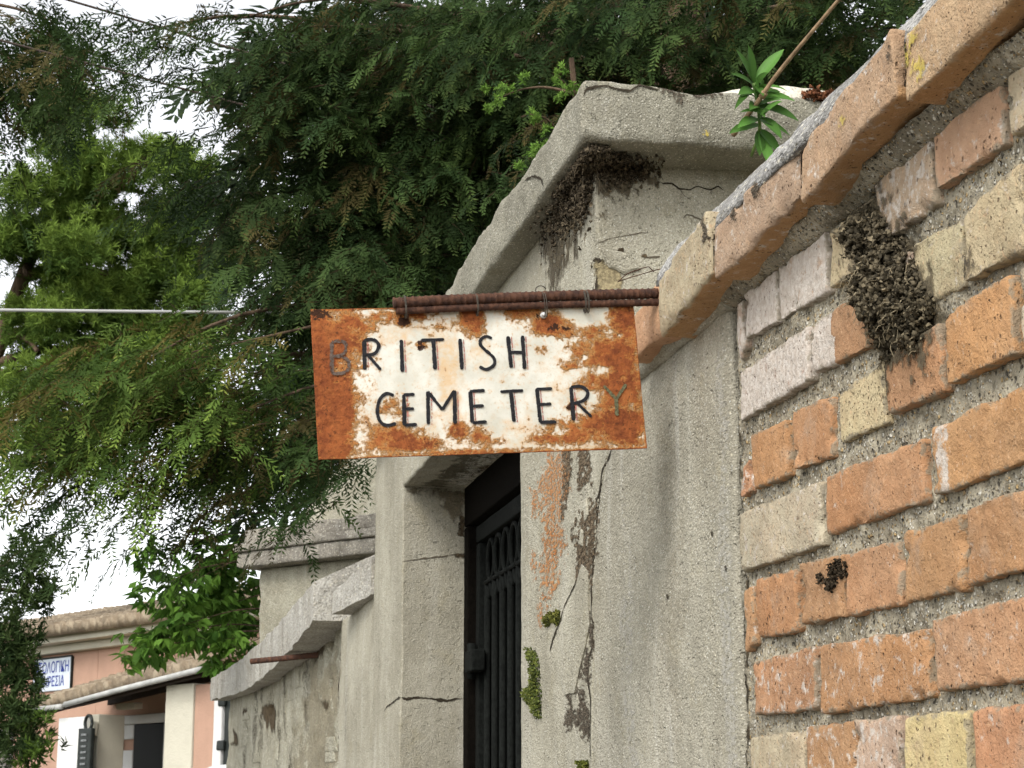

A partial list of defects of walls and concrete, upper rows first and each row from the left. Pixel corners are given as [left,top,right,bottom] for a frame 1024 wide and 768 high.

water stain [596,167,663,218]
water stain [543,219,578,291]
spalling [591,247,647,290]
rust [529,452,571,630]
crack [550,451,611,768]
crack [385,696,463,709]